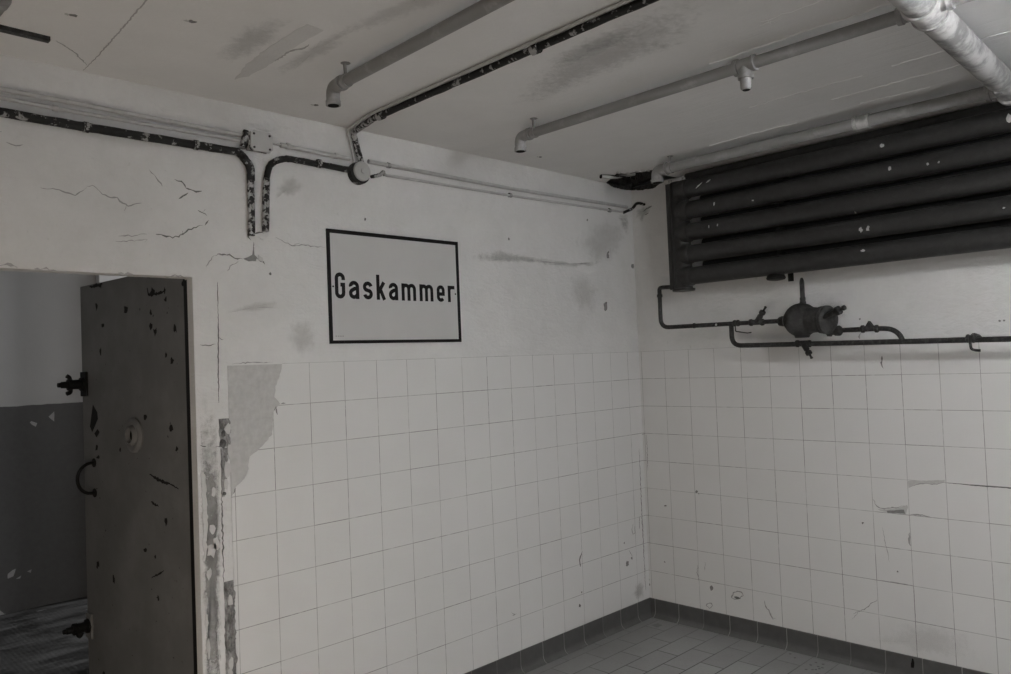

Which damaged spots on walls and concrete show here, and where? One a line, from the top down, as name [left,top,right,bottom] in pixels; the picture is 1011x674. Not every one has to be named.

crack [43,185,140,211]
crack [116,171,209,242]
crack [202,254,269,401]
peeling [201,364,285,674]
crack [952,482,1011,490]